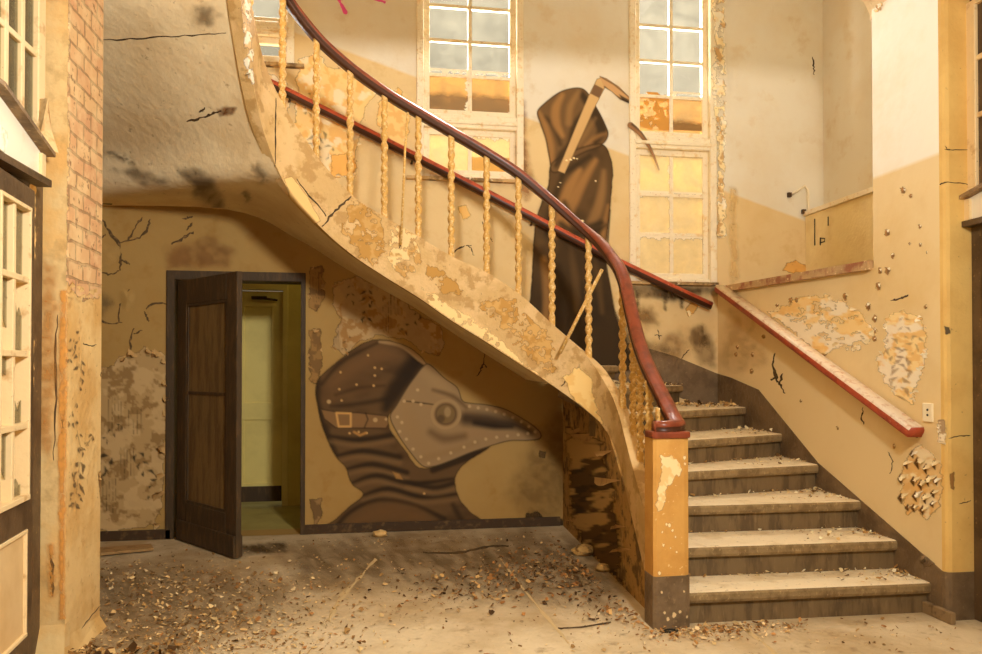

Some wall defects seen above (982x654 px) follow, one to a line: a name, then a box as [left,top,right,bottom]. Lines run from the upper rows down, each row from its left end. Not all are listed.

crack [104,33,226,41]
crack [187,107,221,122]
crack [171,216,194,245]
peeling [284,177,320,224]
crack [83,203,166,350]
peeling [307,201,603,425]
crack [770,353,785,394]
peeling [767,293,928,405]
peeling [98,347,168,533]
peeling [560,426,631,586]
peeling [655,455,686,511]
peeling [898,445,955,520]